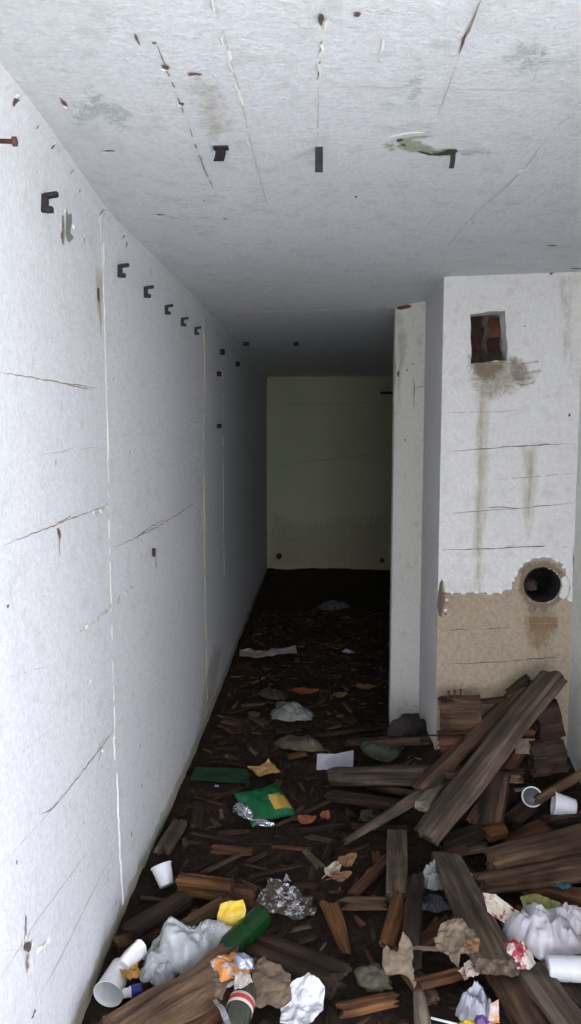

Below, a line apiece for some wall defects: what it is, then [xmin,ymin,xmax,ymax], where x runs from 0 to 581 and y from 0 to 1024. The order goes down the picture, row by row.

crack [149,46,216,220]
spalling [386,132,465,156]
crack [434,1,581,263]
crack [2,372,93,390]
damp [471,359,503,379]
crack [452,443,572,452]
crack [6,506,105,545]
crack [461,503,570,513]
crack [447,544,544,552]
peeling [435,554,572,750]
crack [5,730,114,861]
spalling [22,916,51,969]